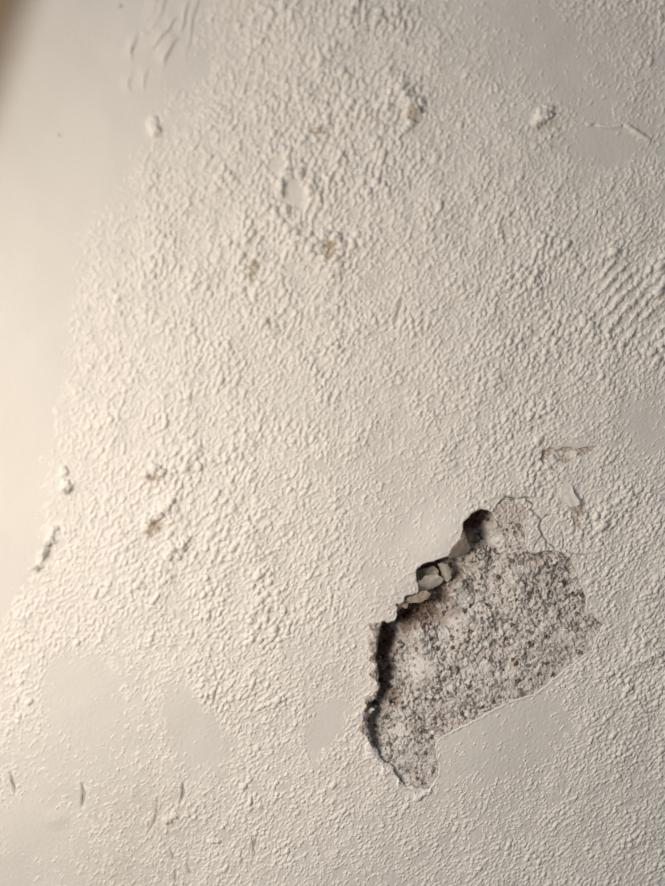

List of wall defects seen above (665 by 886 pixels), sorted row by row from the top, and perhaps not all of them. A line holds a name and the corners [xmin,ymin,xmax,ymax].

spalling [360,497,606,802]